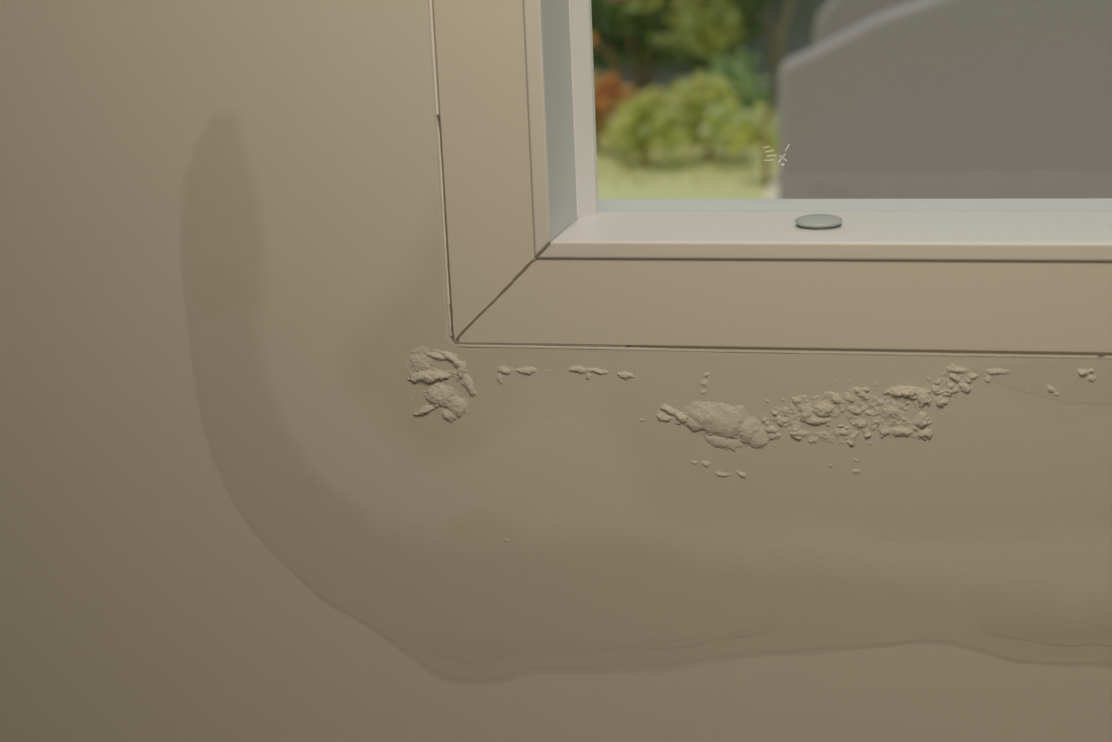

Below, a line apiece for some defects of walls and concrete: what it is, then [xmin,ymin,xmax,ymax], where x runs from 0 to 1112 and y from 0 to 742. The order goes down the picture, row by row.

peeling [406,346,467,384]
leakage [179,105,1112,686]
peeling [655,404,689,427]
peeling [927,363,1010,408]